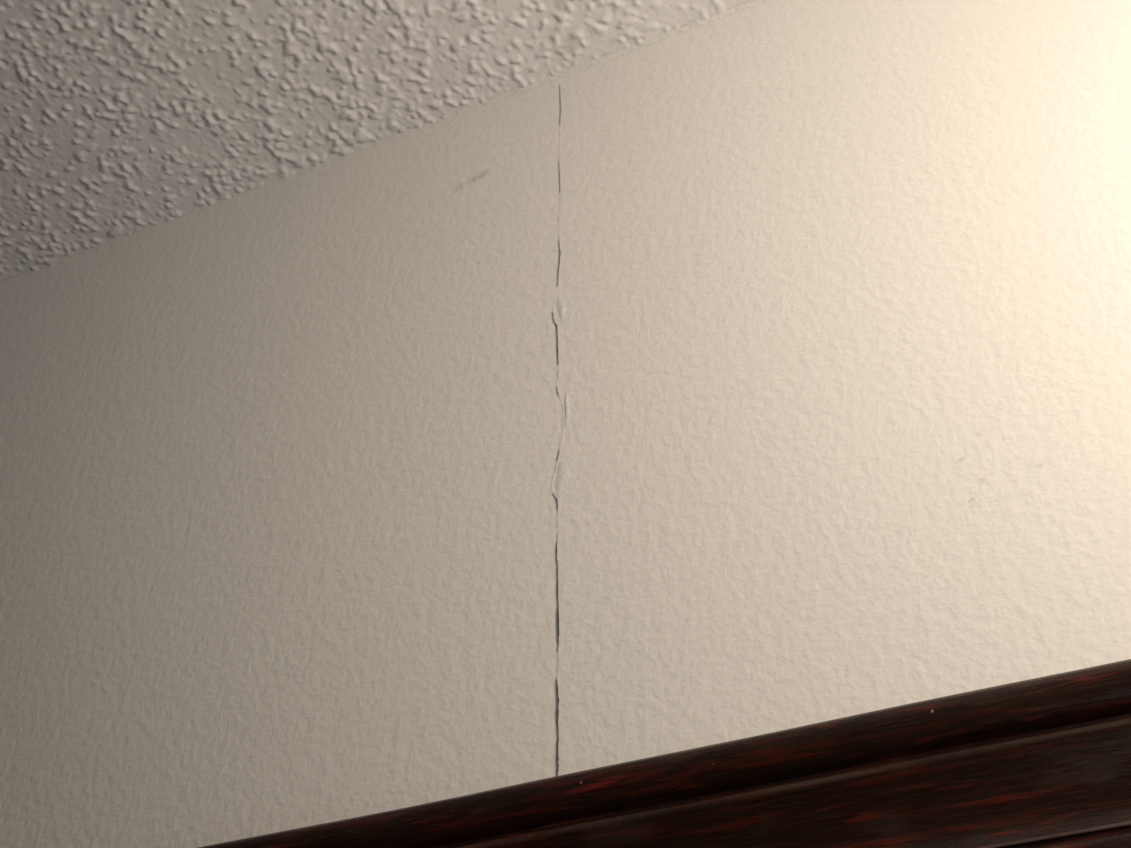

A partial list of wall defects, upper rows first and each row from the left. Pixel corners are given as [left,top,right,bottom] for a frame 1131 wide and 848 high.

crack [553,244,570,509]
crack [553,548,561,651]
crack [553,685,561,776]